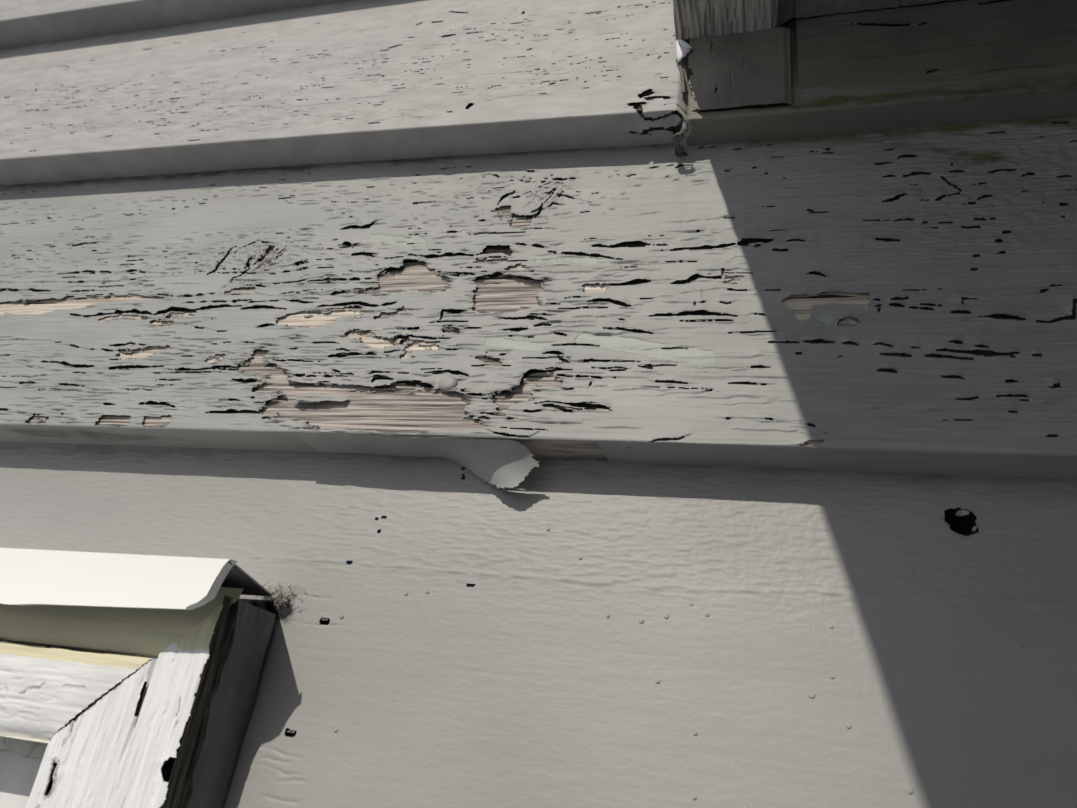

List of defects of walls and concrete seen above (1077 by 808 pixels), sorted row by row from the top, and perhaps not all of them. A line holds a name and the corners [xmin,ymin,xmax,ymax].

peeling [676,39,692,63]
peeling [623,87,688,134]
peeling [215,281,261,299]
peeling [715,271,748,290]
peeling [269,250,614,364]
peeling [774,287,879,334]
peeling [0,290,203,364]
peeling [20,408,55,428]
peeling [91,409,181,432]
peeling [200,332,715,489]
peeling [790,432,834,451]
spalling [939,508,979,539]